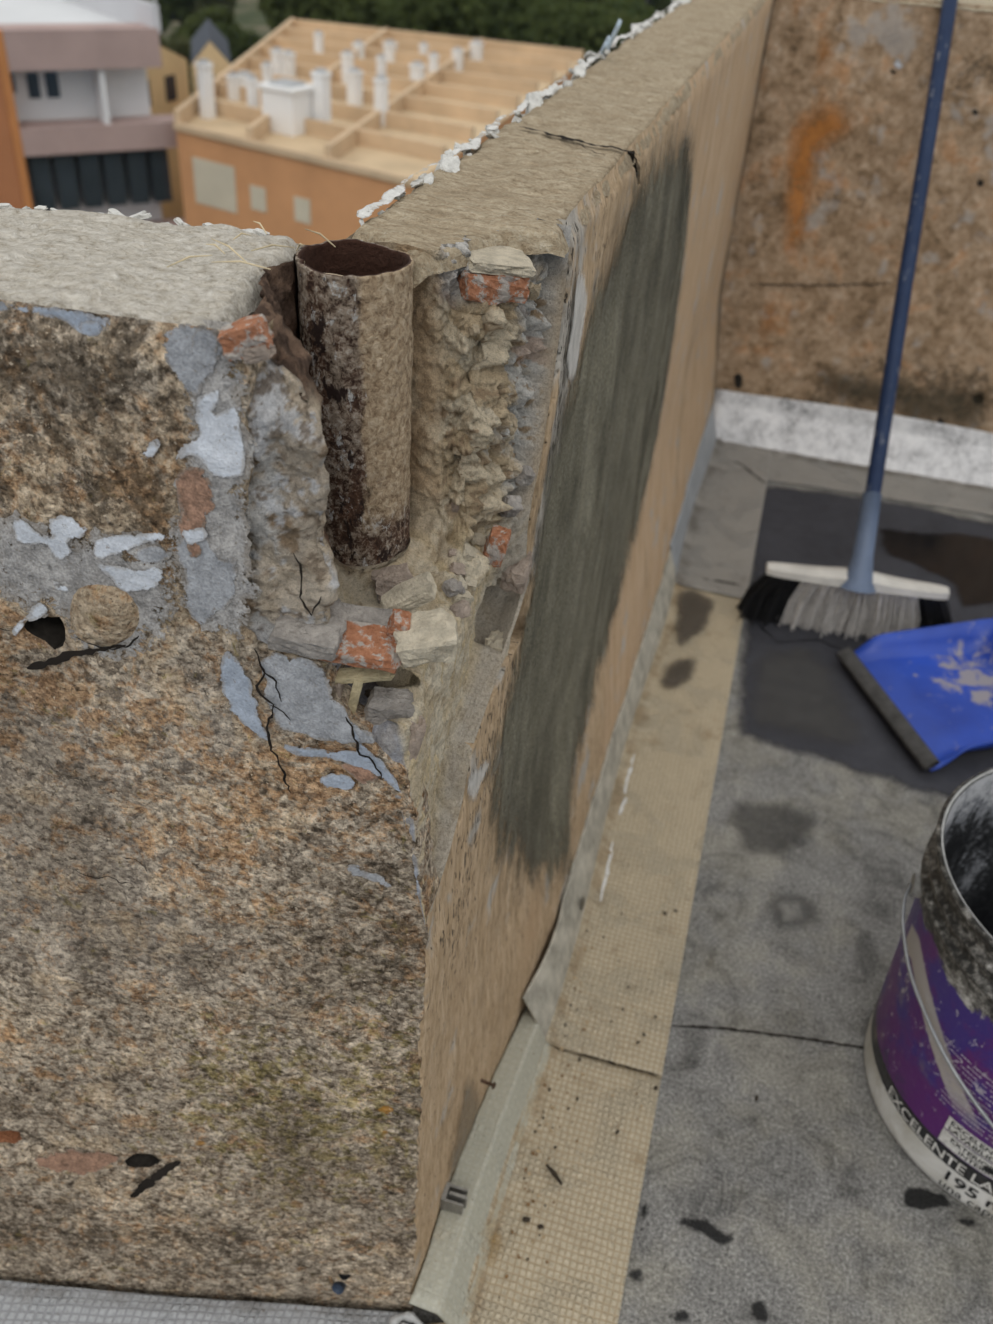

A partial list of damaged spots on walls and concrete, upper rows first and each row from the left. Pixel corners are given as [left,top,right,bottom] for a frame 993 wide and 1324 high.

peeling [356,0,691,226]
crack [520,126,637,156]
peeling [0,203,57,211]
peeling [98,208,213,226]
spalling [0,218,571,924]
crack [293,553,321,616]
crack [76,636,139,650]
crack [254,648,291,793]
crack [345,716,382,778]